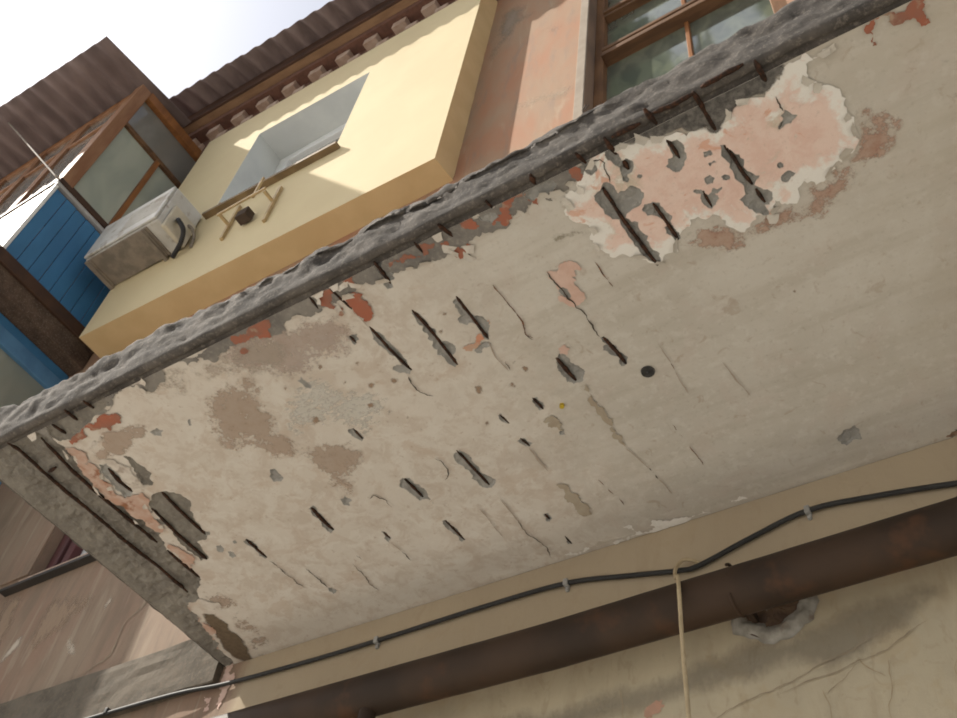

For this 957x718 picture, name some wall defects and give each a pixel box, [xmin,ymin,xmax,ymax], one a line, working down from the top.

peeling [864,0,931,46]
rust [755,109,901,233]
peeling [179,42,859,374]
rust [690,226,745,250]
spalling [348,428,364,441]
spalling [453,450,496,488]
spalling [399,478,430,501]
spalling [0,370,267,712]
spalling [309,506,334,533]
spalling [442,520,466,542]
crack [717,620,927,718]